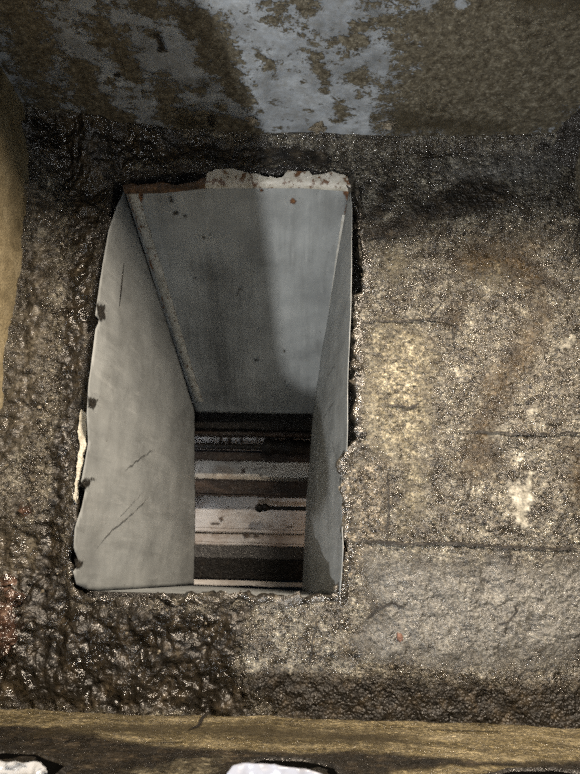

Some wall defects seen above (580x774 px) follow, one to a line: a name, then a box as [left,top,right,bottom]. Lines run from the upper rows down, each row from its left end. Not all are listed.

peeling [0,0,286,133]
peeling [255,0,580,137]
damp [364,165,520,239]
damp [0,107,417,744]
damp [366,327,427,509]
damp [250,669,580,729]